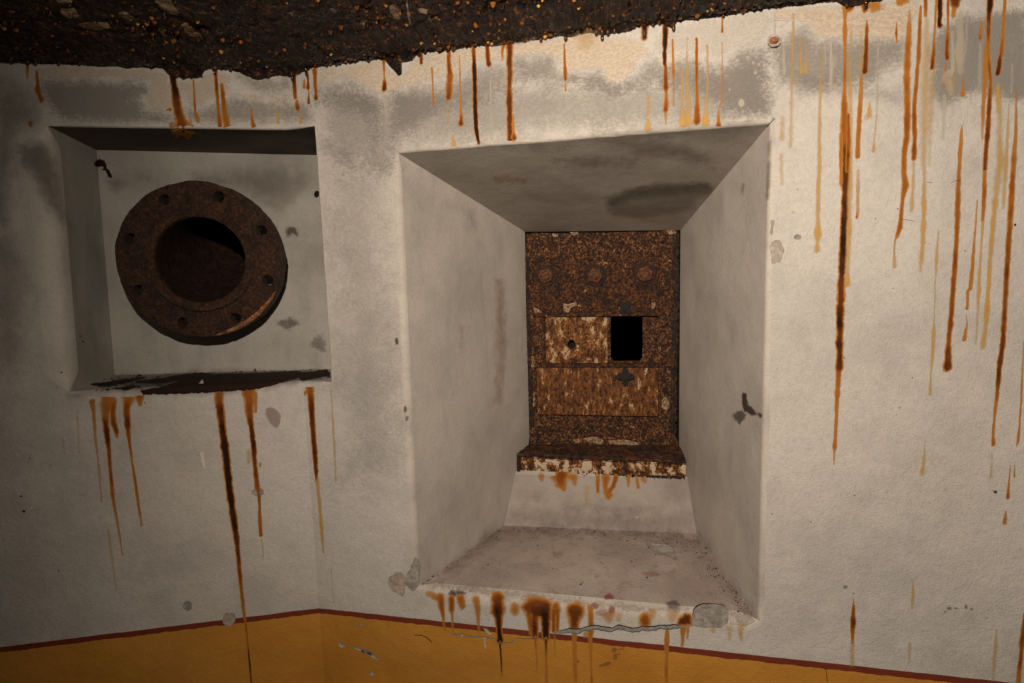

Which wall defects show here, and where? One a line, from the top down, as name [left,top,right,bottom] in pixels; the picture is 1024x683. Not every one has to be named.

corrosion [894,0,965,271]
corrosion [0,0,882,460]
water stain [616,184,708,201]
corrosion [929,0,1017,446]
corrosion [1016,356,1024,446]
corrosion [89,369,331,683]
corrosion [993,466,1015,525]
spalling [388,558,420,596]
corrosion [427,591,612,683]
crack [420,624,689,648]
corrosion [664,613,693,683]
spalling [692,603,754,628]